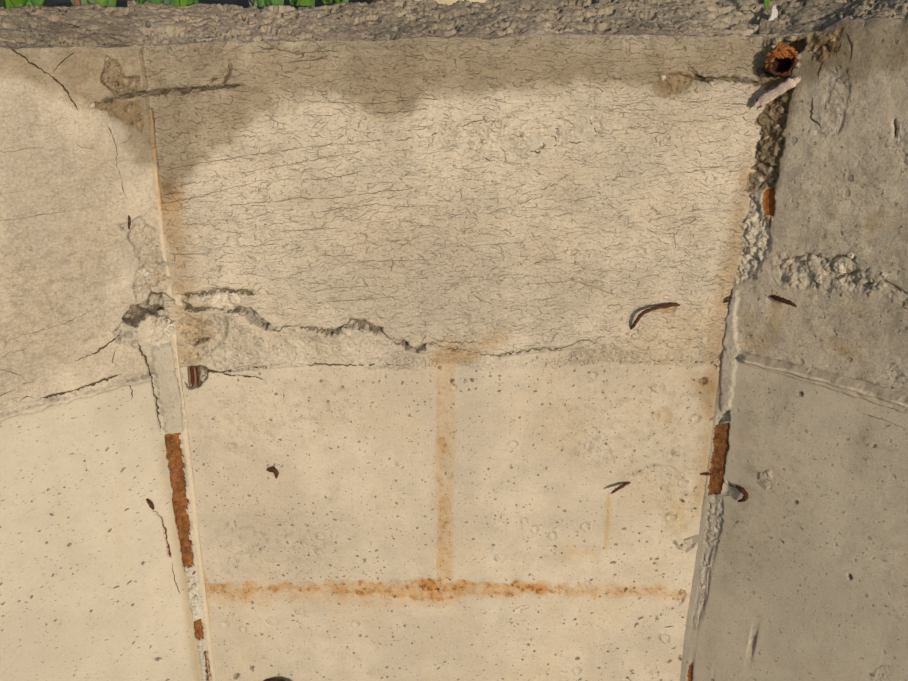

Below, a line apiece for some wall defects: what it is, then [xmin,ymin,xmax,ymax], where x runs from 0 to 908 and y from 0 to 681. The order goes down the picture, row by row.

crack [260,46,342,64]
crack [3,41,254,194]
crack [291,79,447,116]
crack [518,118,597,166]
crack [610,67,758,134]
crack [641,156,737,174]
crack [162,135,454,262]
crack [488,195,599,214]
crack [616,205,704,248]
crack [488,242,616,296]
crack [182,273,601,381]
crack [0,306,161,430]